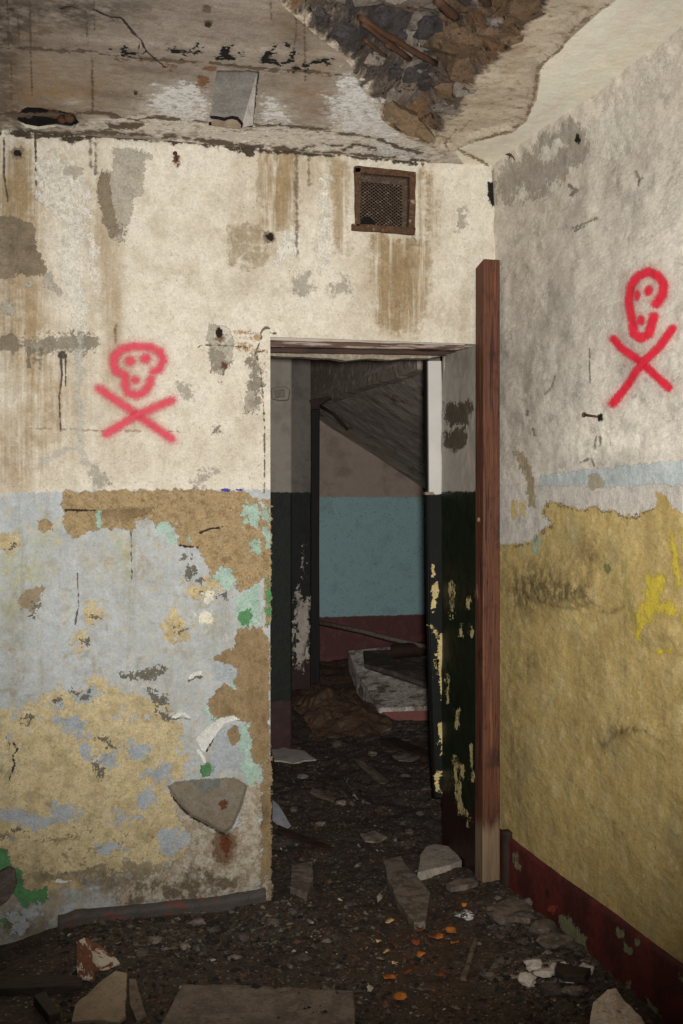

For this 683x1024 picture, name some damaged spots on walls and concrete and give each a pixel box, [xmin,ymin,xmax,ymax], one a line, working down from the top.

crack [0,3,609,166]
spalling [357,14,438,66]
damp [226,153,347,275]
damp [0,132,102,465]
damp [372,233,428,330]
damp [443,397,474,453]
peeling [500,474,683,554]
peeling [0,465,274,937]
peeling [292,545,311,674]
peeling [428,564,474,730]
peeling [433,722,475,828]
corrosion [212,831,237,864]